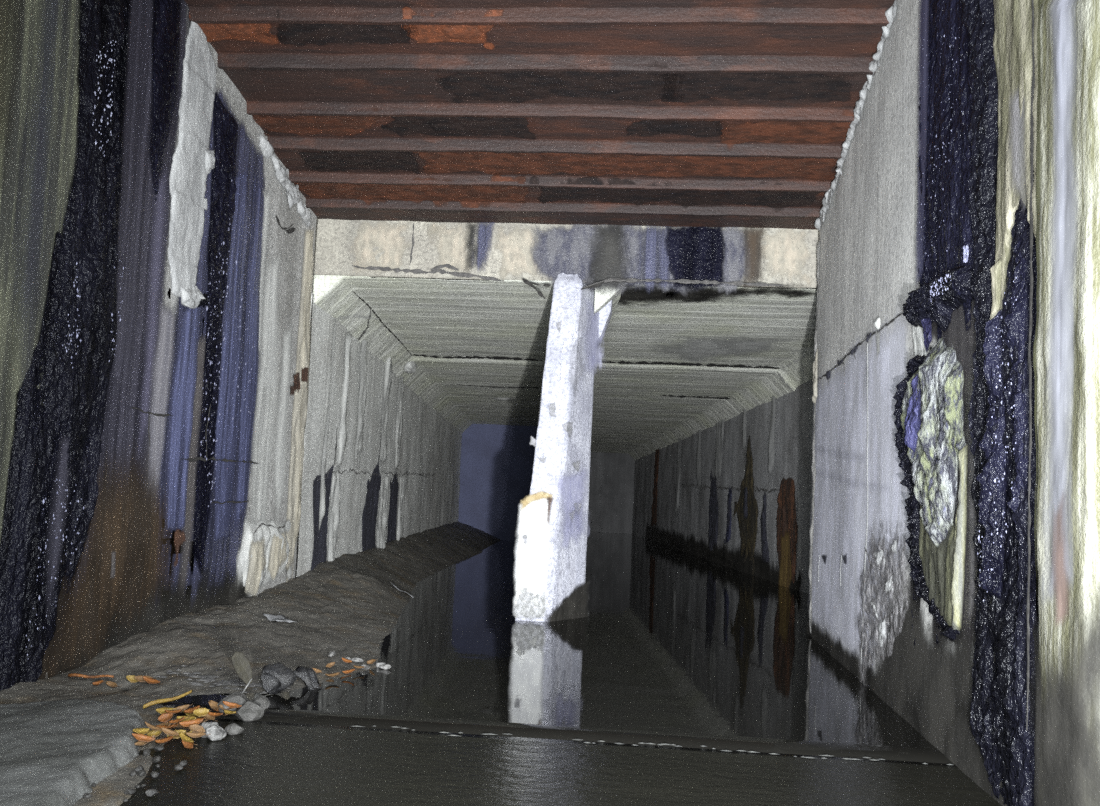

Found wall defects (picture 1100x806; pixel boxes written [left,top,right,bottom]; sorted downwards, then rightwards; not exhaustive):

corrosion [189,15,279,44]
corrosion [402,7,503,50]
corrosion [253,110,380,136]
corrosion [296,110,854,208]
leakage [532,224,810,305]
leakage [0,0,314,691]
leakage [807,0,1039,806]
spalling [858,338,966,685]